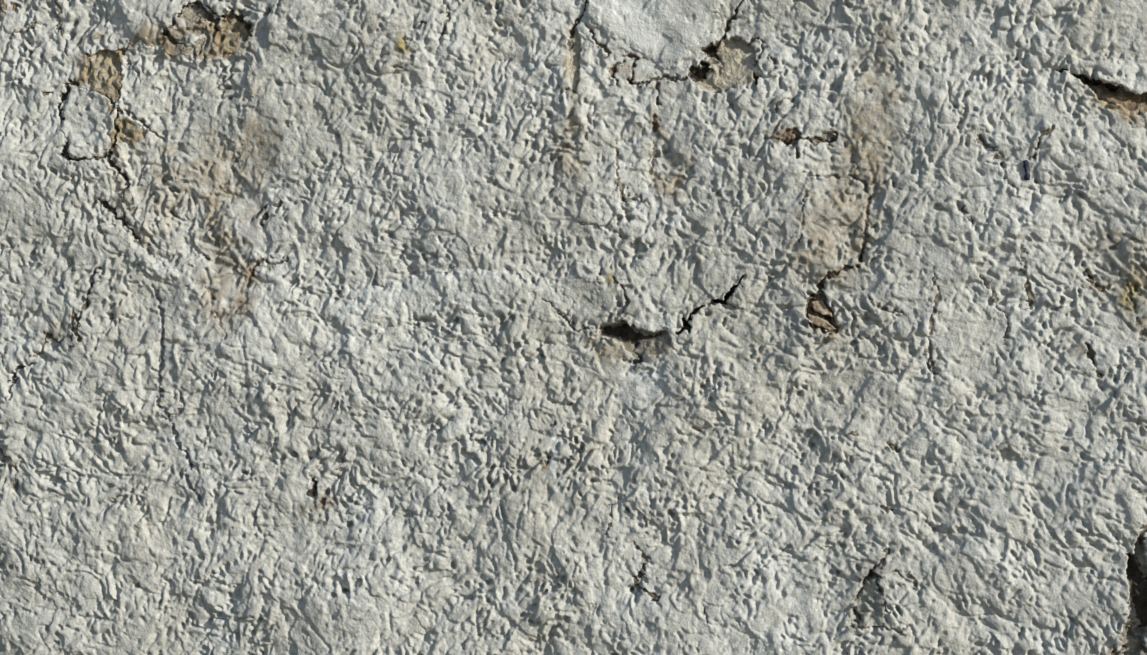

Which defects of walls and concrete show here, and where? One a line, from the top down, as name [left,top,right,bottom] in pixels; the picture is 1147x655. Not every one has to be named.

peeling [42,0,255,262]
crack [588,27,687,106]
spalling [1055,60,1147,121]
crack [776,128,902,287]
crack [542,268,630,332]
crack [675,274,744,335]
crack [868,276,942,378]
crack [979,241,1036,374]